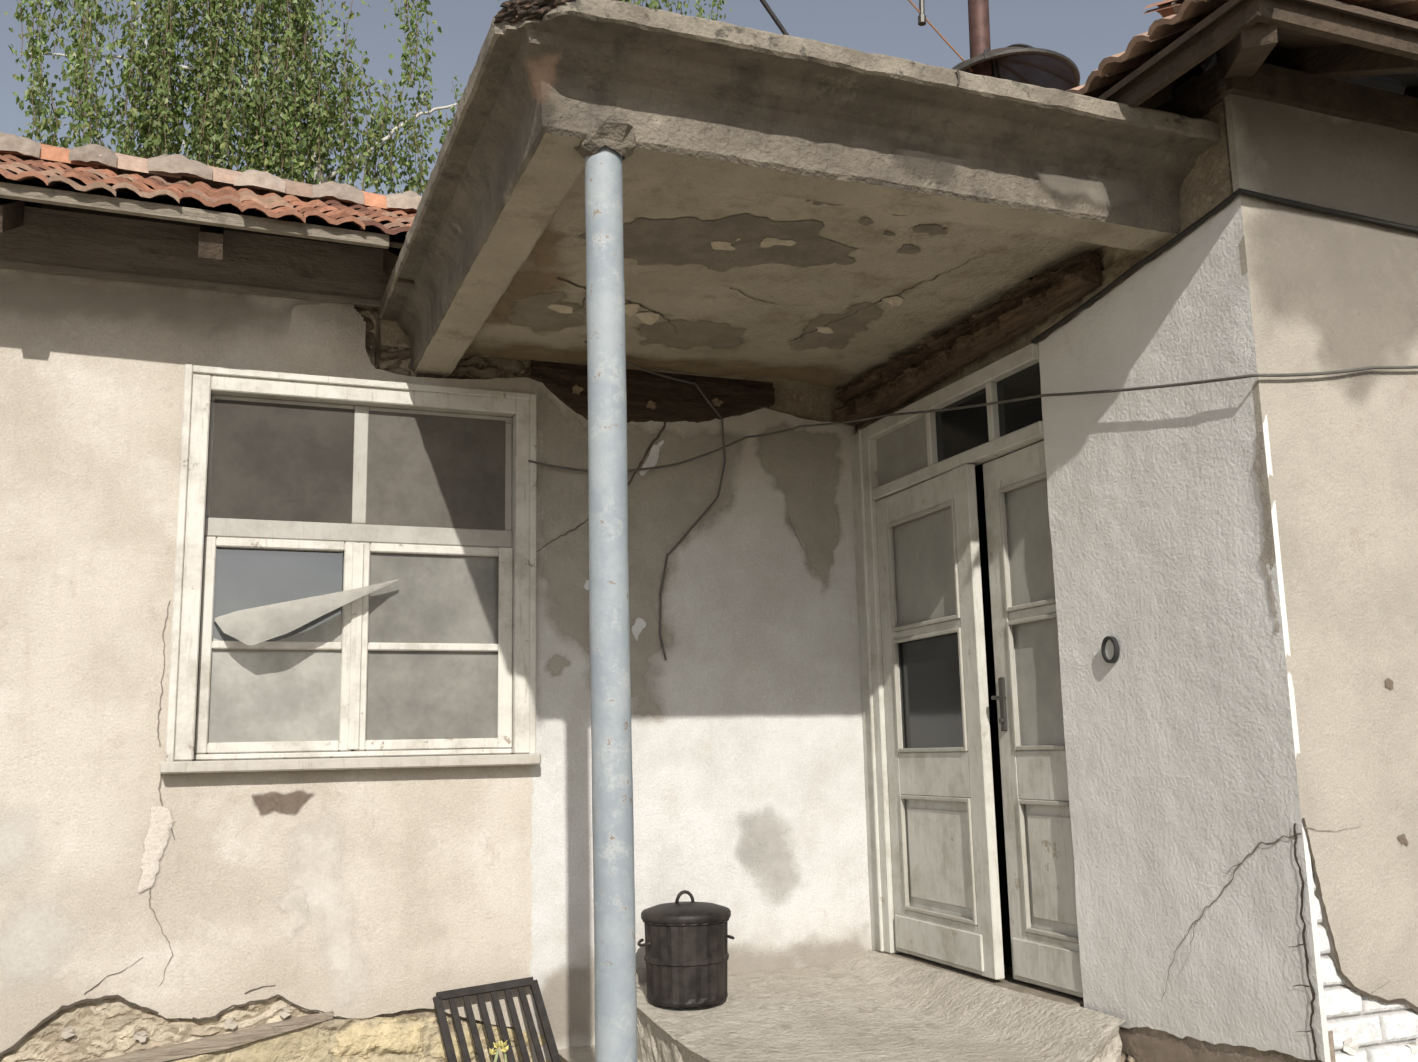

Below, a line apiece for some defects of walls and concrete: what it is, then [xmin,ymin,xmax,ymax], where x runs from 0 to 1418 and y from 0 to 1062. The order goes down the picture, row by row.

spalling [494,0,573,24]
peeling [623,214,858,272]
peeling [505,292,586,332]
peeling [638,320,744,349]
peeling [354,307,590,652]
peeling [626,369,775,718]
crack [0,601,175,1056]
crack [1161,818,1418,1062]
flaking render [1312,871,1418,1062]
flaking render [0,997,311,1062]
crack [192,985,325,1021]
flaking render [1119,1027,1250,1062]